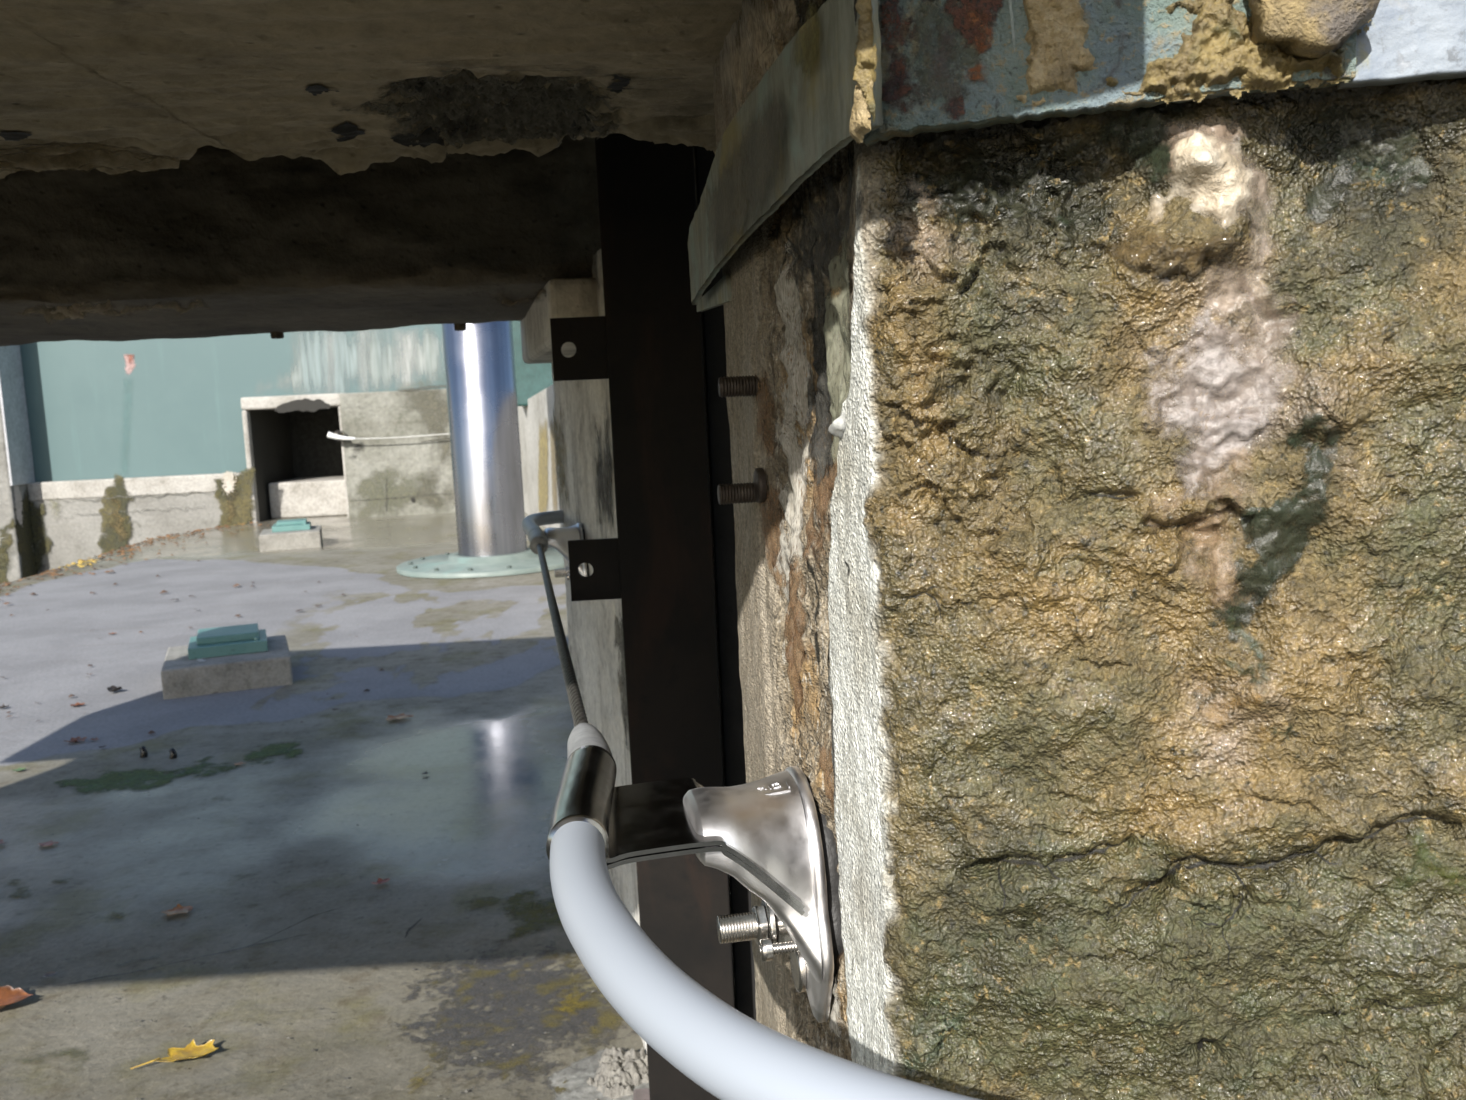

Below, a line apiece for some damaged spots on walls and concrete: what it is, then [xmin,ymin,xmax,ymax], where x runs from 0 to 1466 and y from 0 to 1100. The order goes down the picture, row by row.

corrosion [880,0,916,113]
corrosion [945,0,1003,80]
damp [1015,0,1357,106]
damp [1110,122,1294,489]
damp [0,485,38,584]
damp [221,471,239,523]
damp [1196,518,1232,596]
damp [1229,570,1281,641]
crack [973,840,1130,913]
crack [1111,816,1444,964]